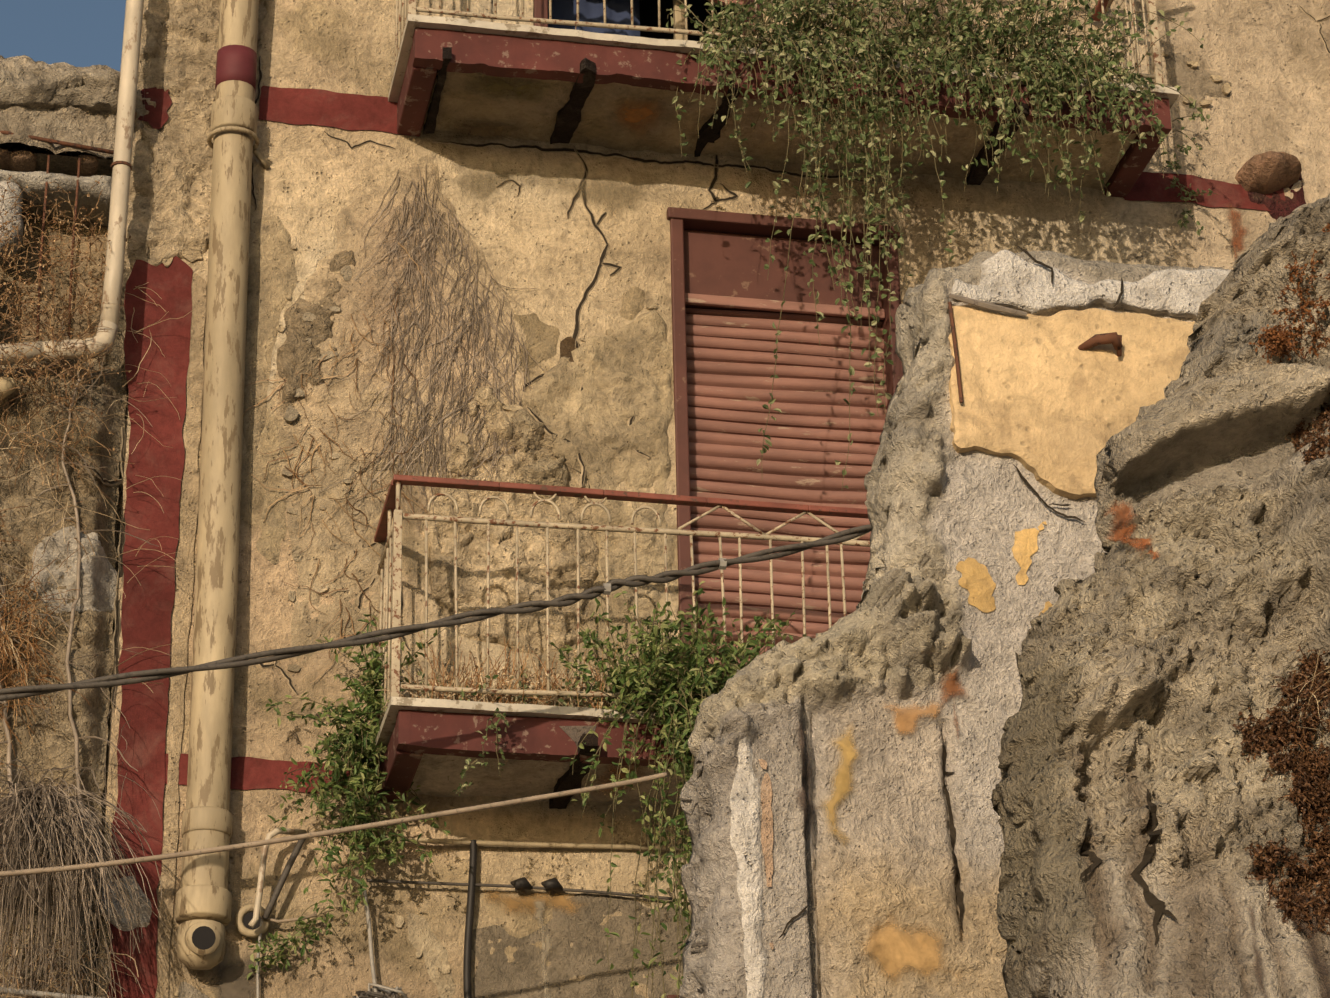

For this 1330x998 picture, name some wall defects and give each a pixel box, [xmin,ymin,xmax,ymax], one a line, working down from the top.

crack [1298,5,1330,54]
crack [323,131,396,150]
crack [433,140,879,487]
peeling [949,250,1231,500]
crack [1013,464,1085,522]
rust [1108,503,1159,559]
crack [941,729,964,932]